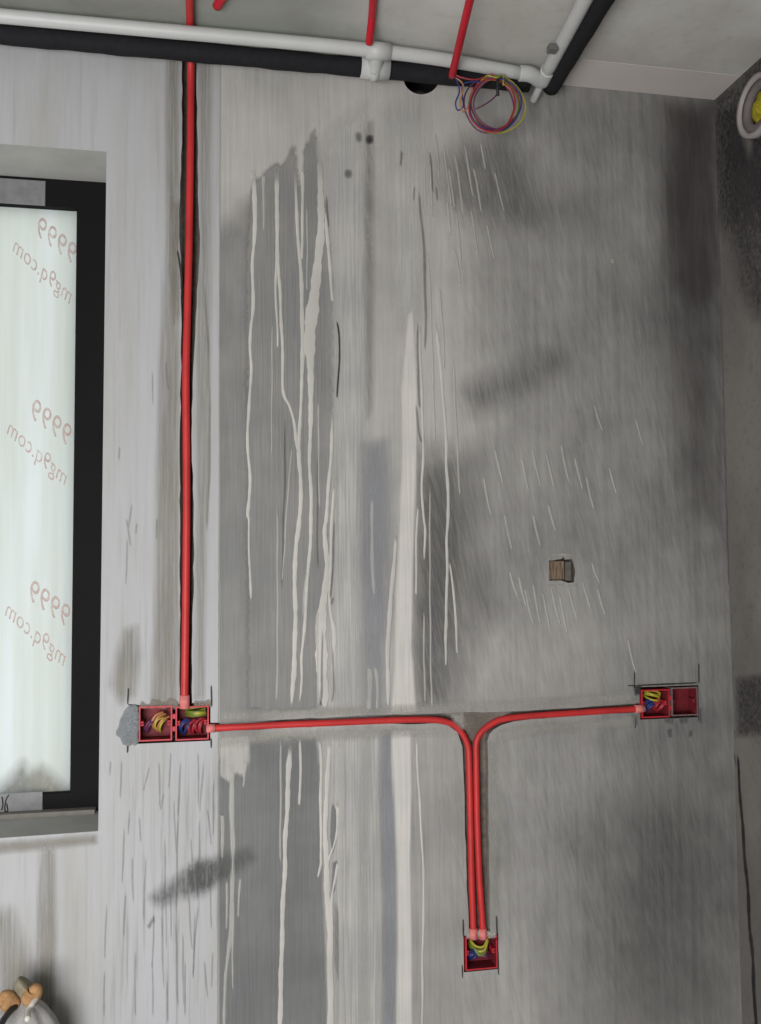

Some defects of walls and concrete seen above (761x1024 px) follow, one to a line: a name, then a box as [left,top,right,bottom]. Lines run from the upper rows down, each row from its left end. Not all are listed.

leakage [208,109,504,724]
leakage [219,730,425,1024]